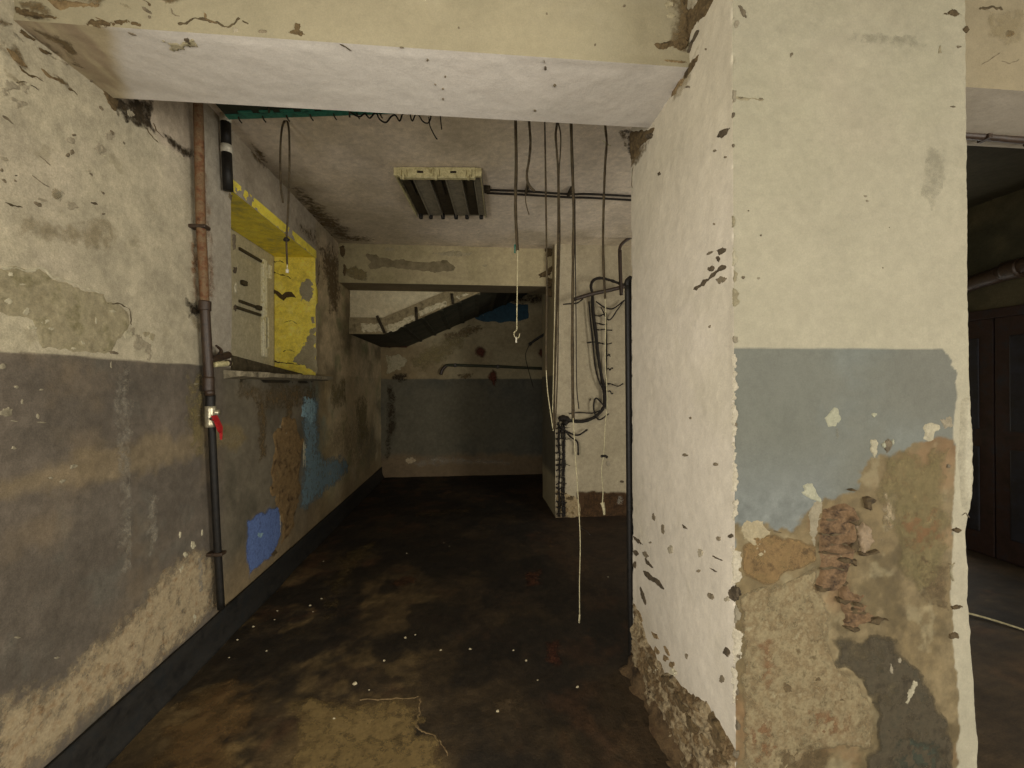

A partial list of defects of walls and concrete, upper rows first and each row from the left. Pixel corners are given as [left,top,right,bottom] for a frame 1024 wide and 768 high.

damp [6,48,77,94]
crack [86,0,305,36]
spalling [654,0,713,97]
damp [99,91,194,157]
peeling [0,266,155,368]
peeling [293,317,318,373]
peeling [299,279,314,302]
spalling [693,247,760,307]
spalling [246,396,348,572]
peeling [630,336,953,768]
damp [0,529,217,768]
damp [154,680,253,768]